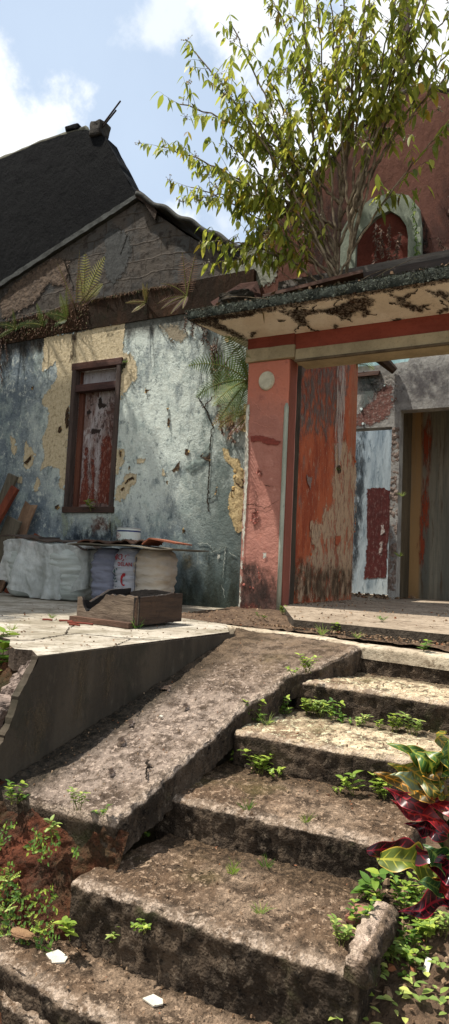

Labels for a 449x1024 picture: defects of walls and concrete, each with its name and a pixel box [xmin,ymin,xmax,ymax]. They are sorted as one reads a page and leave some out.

spalling [0,257,70,319]
damp [189,278,449,381]
peeling [10,324,146,506]
peeling [162,404,281,607]
peeling [294,440,357,603]
damp [294,431,365,601]
peeling [356,374,399,594]